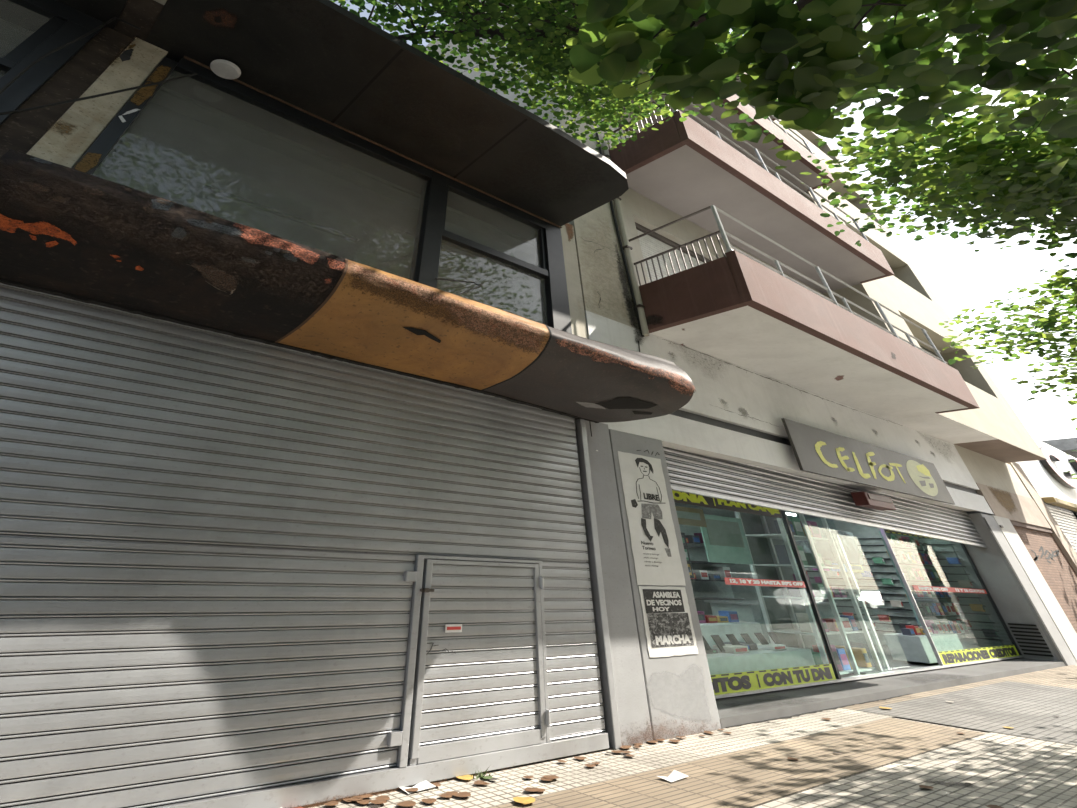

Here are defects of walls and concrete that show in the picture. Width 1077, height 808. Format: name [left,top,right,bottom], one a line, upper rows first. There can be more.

rust [232,221,542,353]